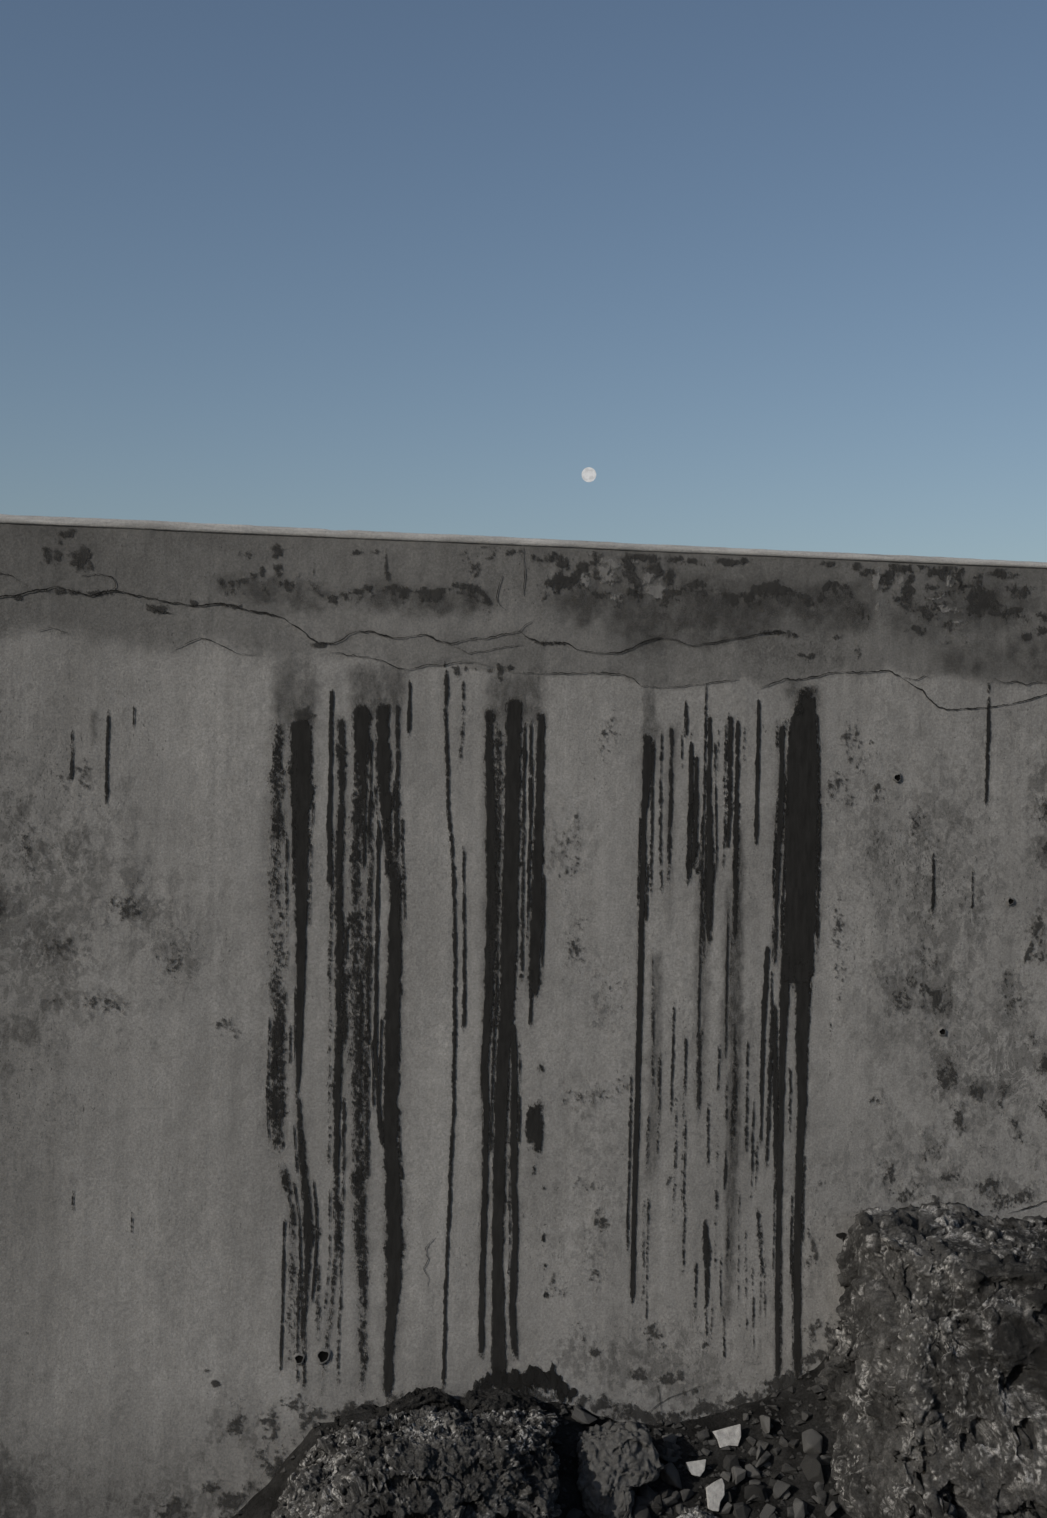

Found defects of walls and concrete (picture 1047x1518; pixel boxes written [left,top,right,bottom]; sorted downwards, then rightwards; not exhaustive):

damp [41,528,93,572]
damp [219,543,492,613]
crack [0,550,1047,710]
damp [672,556,869,640]
damp [1021,612,1047,641]
damp [59,709,110,804]
damp [110,878,141,921]
damp [886,947,952,1015]
damp [149,670,411,1518]
damp [441,661,579,1400]
damp [518,683,884,1426]
damp [877,1158,1035,1212]